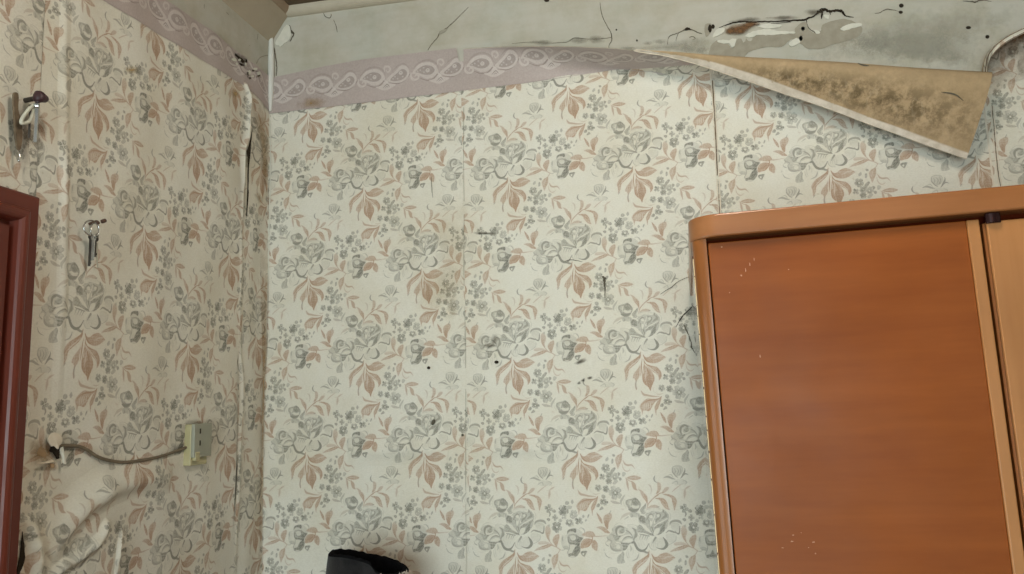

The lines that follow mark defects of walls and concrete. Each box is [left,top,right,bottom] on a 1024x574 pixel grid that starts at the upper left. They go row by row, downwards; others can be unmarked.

crack [512,5,612,45]
flaking render [704,19,862,57]